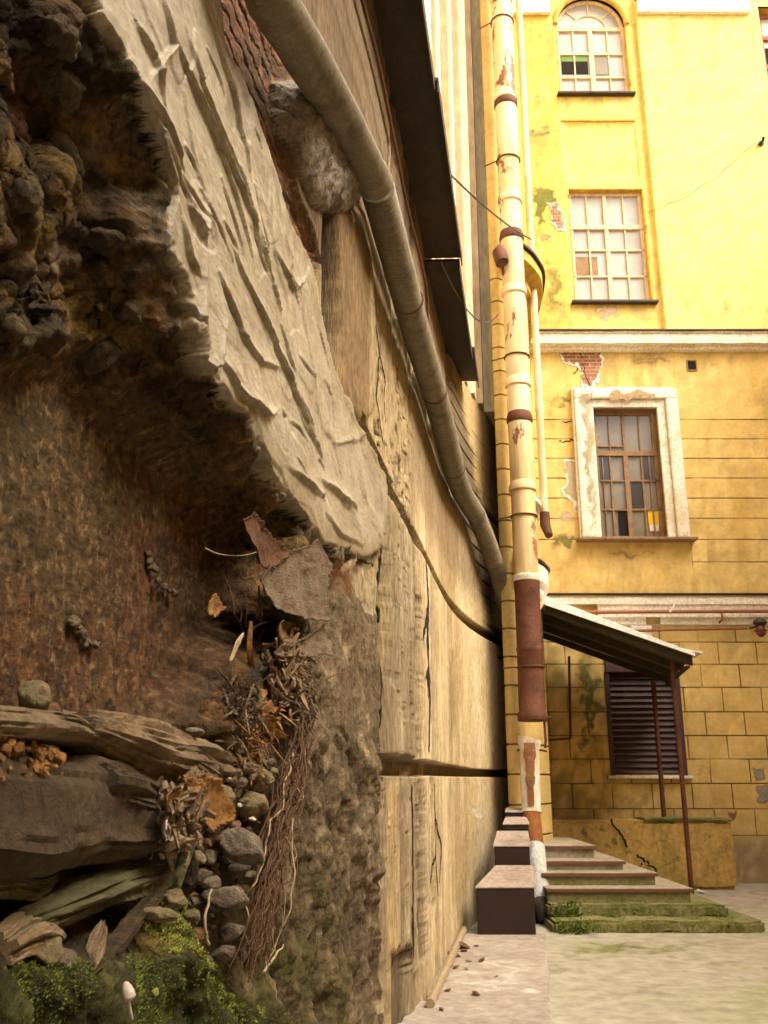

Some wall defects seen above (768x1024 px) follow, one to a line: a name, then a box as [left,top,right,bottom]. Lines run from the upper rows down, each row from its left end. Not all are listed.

flaking render [547,202,566,231]
flaking render [556,352,604,387]
flaking render [560,459,578,520]
corrosion [513,579,548,722]
crack [408,557,442,958]
corrosion [523,743,536,806]
crack [610,818,657,872]